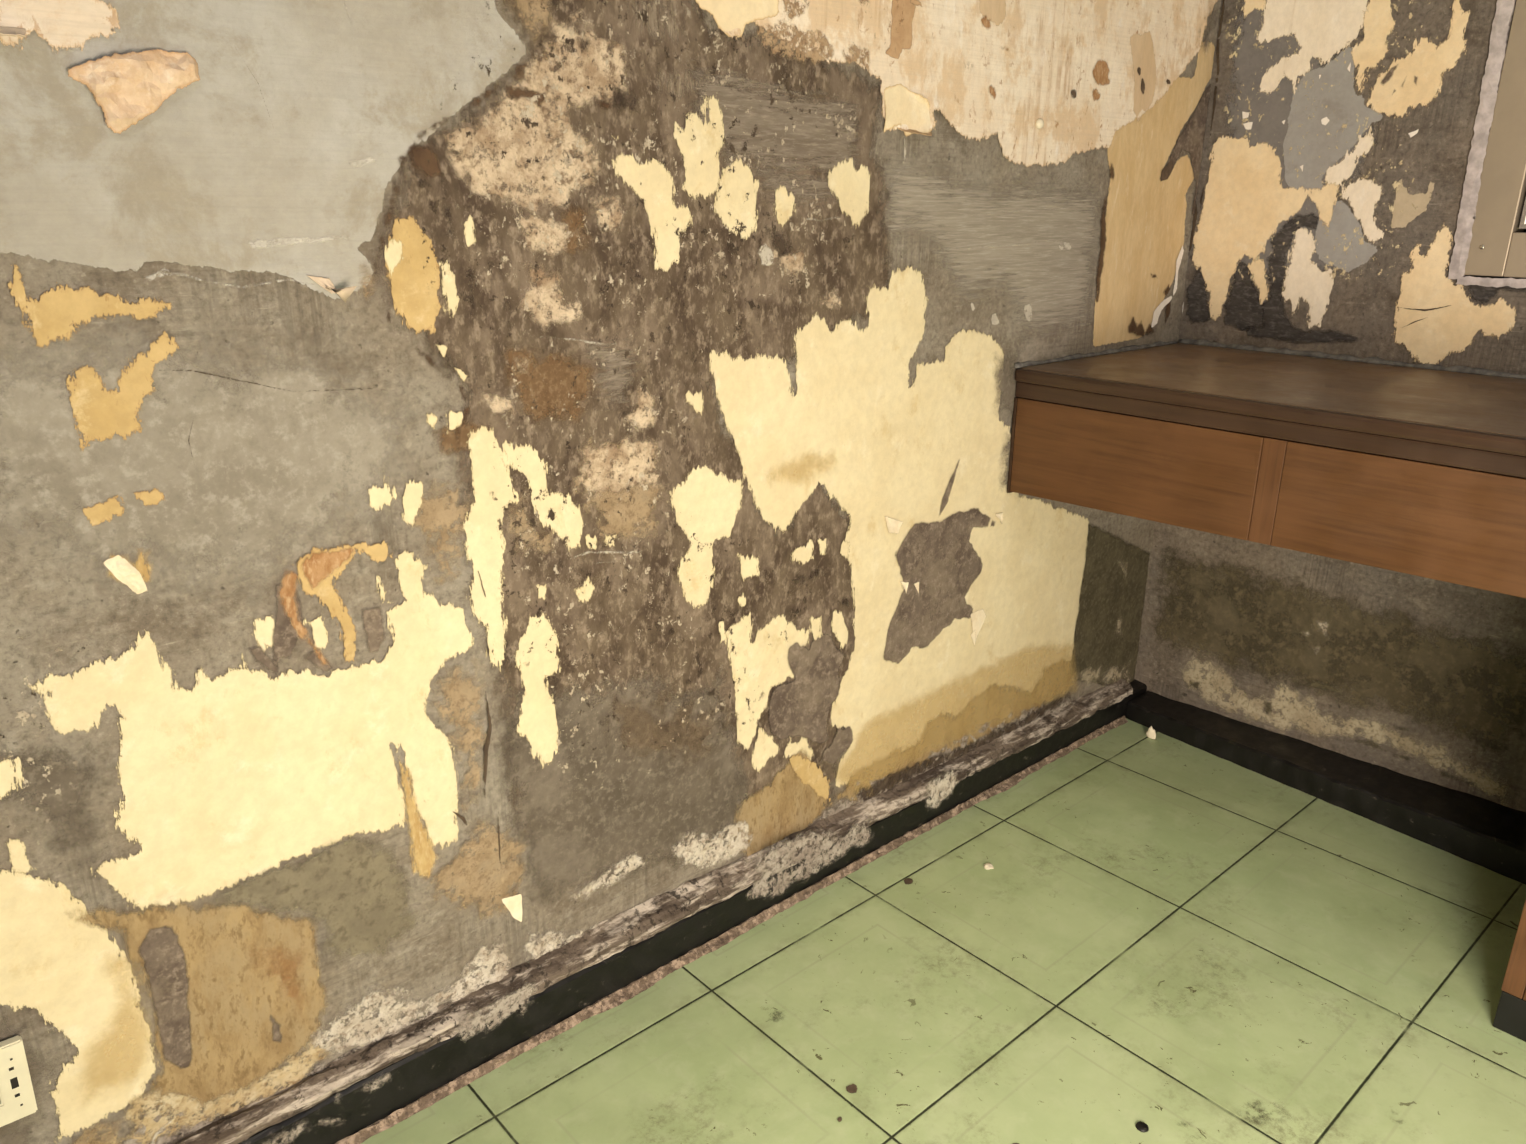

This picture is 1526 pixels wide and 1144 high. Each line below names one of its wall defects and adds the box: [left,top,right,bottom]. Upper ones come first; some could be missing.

peeling [1096,165,1114,302]
peeling [0,0,1089,911]
leakage [76,0,1150,1144]
leakage [1155,549,1526,798]
leakage [0,753,96,862]
peeling [0,734,160,1142]
spalling [164,678,1133,1144]
leakage [0,1121,31,1144]
leakage [25,1051,44,1085]